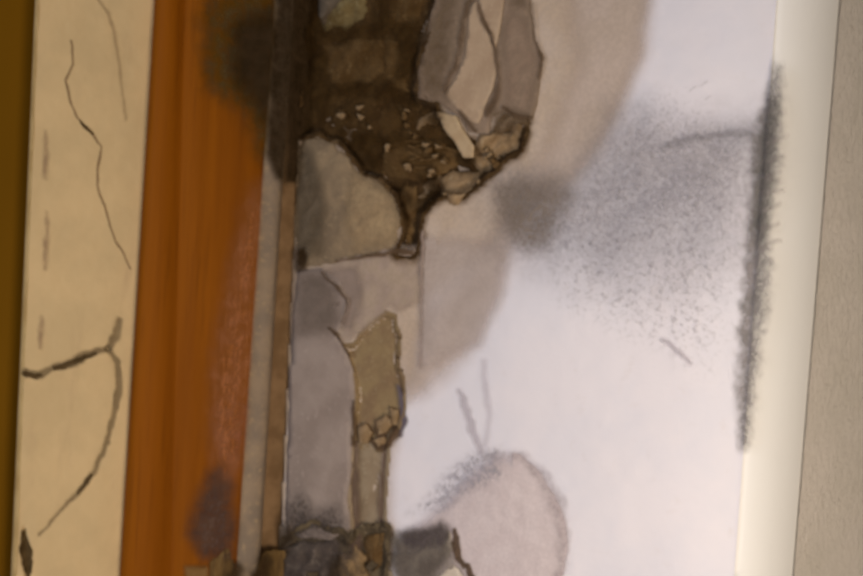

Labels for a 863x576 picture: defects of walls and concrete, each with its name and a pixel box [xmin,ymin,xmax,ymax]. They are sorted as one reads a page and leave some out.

crack [65,41,131,269]
leakage [206,0,319,182]
hole [294,249,306,271]
spalling [299,0,544,369]
leakage [289,0,782,446]
crack [22,318,122,535]
spalling [342,310,407,453]
spalling [279,519,392,576]
leakage [390,525,462,576]